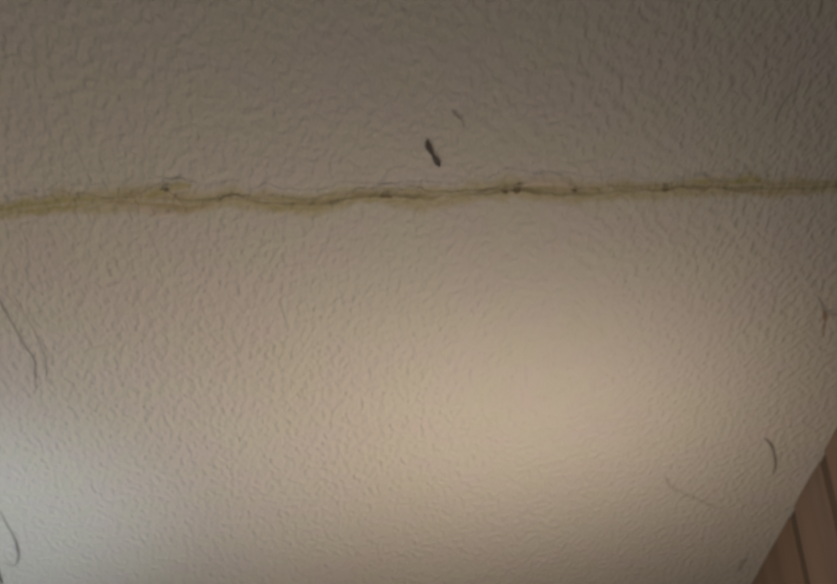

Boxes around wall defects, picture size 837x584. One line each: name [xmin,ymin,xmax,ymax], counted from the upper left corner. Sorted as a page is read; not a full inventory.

damp [0,165,837,224]
crack [0,182,837,213]
crack [0,288,49,394]